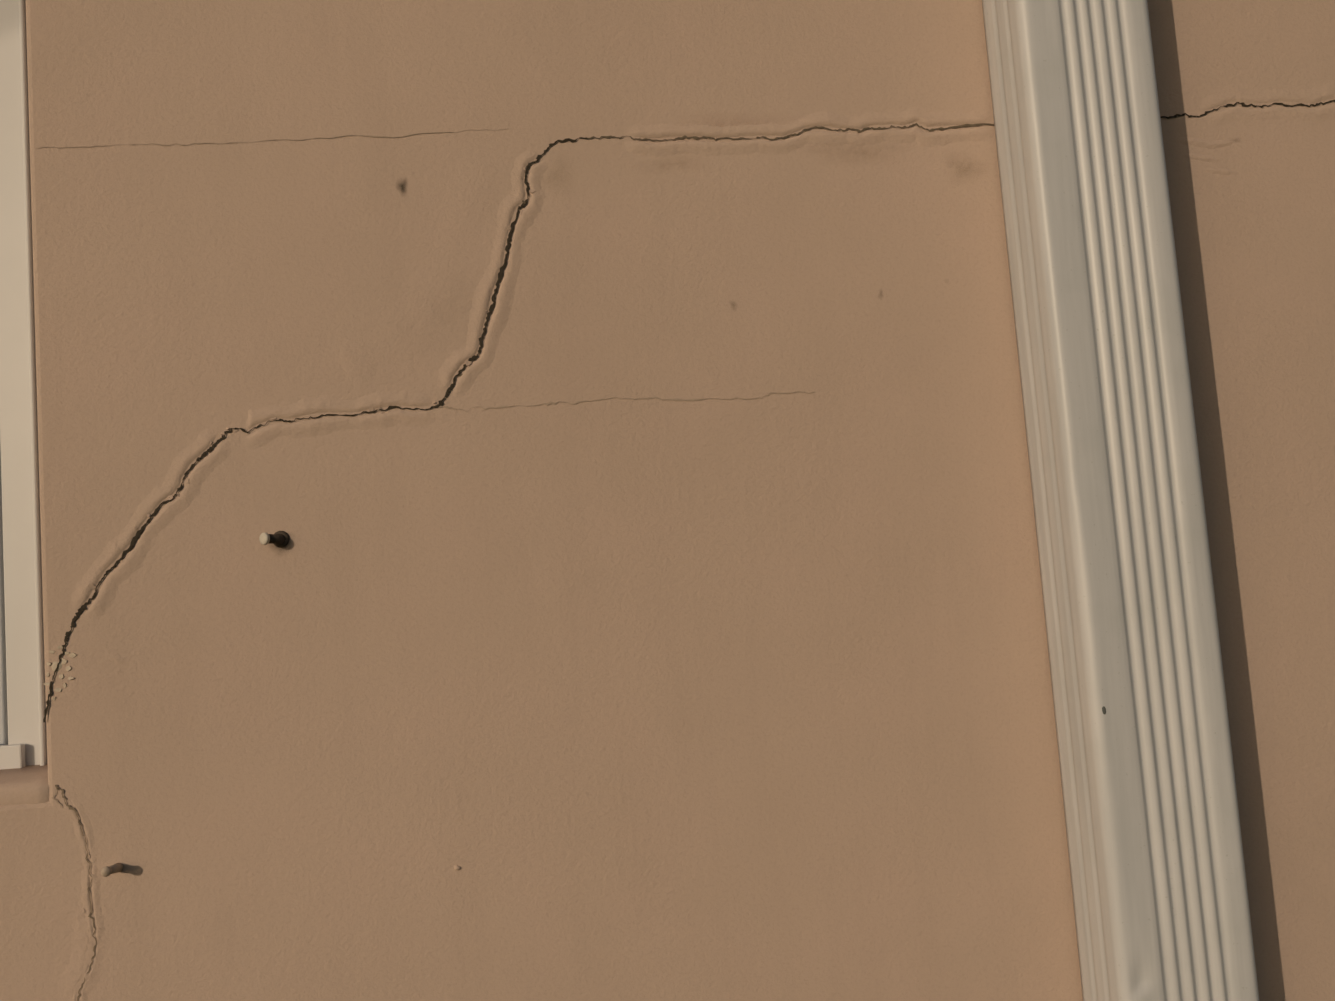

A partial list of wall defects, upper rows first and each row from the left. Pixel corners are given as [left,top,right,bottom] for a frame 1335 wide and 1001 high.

crack [1160,100,1335,119]
crack [39,123,994,722]
crack [51,785,107,1001]